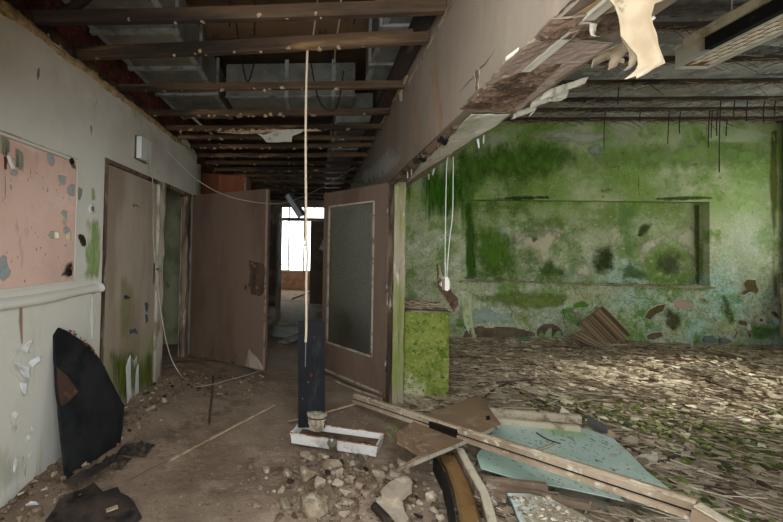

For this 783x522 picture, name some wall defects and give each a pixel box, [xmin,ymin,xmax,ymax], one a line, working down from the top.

spalling [737,43,783,57]
spalling [0,0,196,161]
spalling [407,0,620,182]
spalling [705,125,775,144]
peeling [0,136,24,176]
damp [770,131,778,228]
spalling [48,210,87,248]
damp [466,203,565,279]
damp [576,227,621,277]
mould [624,265,647,278]
damp [638,224,696,260]
spalling [739,278,760,296]